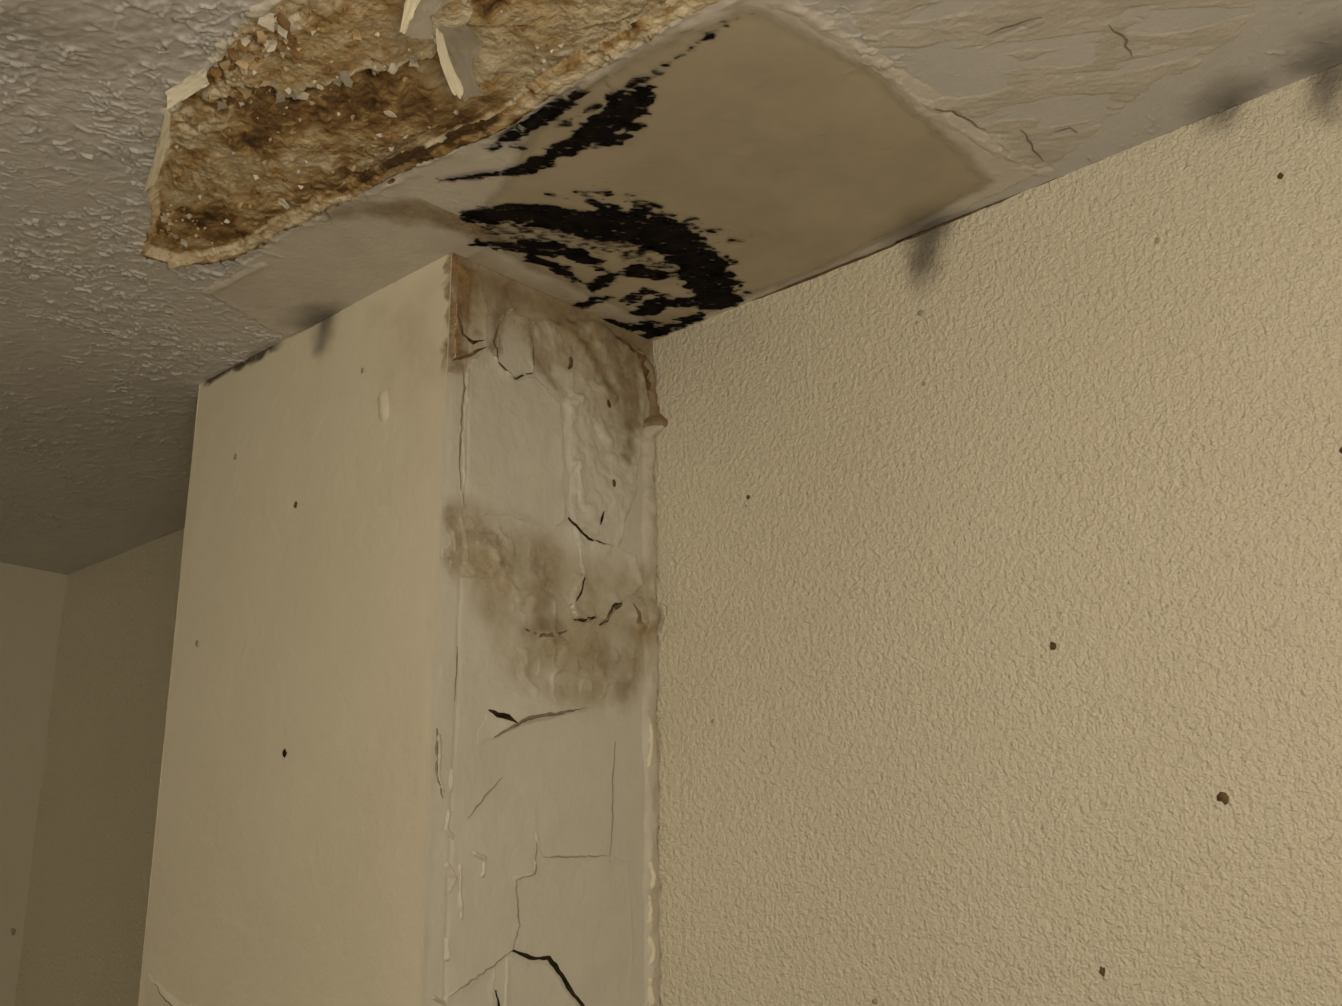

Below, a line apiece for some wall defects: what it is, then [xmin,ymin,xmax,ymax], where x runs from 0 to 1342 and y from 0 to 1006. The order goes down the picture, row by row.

peeling [144,12,319,192]
peeling [372,58,419,75]
peeling [399,0,484,101]
leakage [439,21,729,181]
leakage [374,191,751,393]
crack [458,371,466,504]
peeling [440,269,644,638]
peeling [615,336,668,428]
crack [452,647,460,701]
peeling [435,728,454,840]
crack [449,741,616,1006]
peeling [431,833,656,1006]